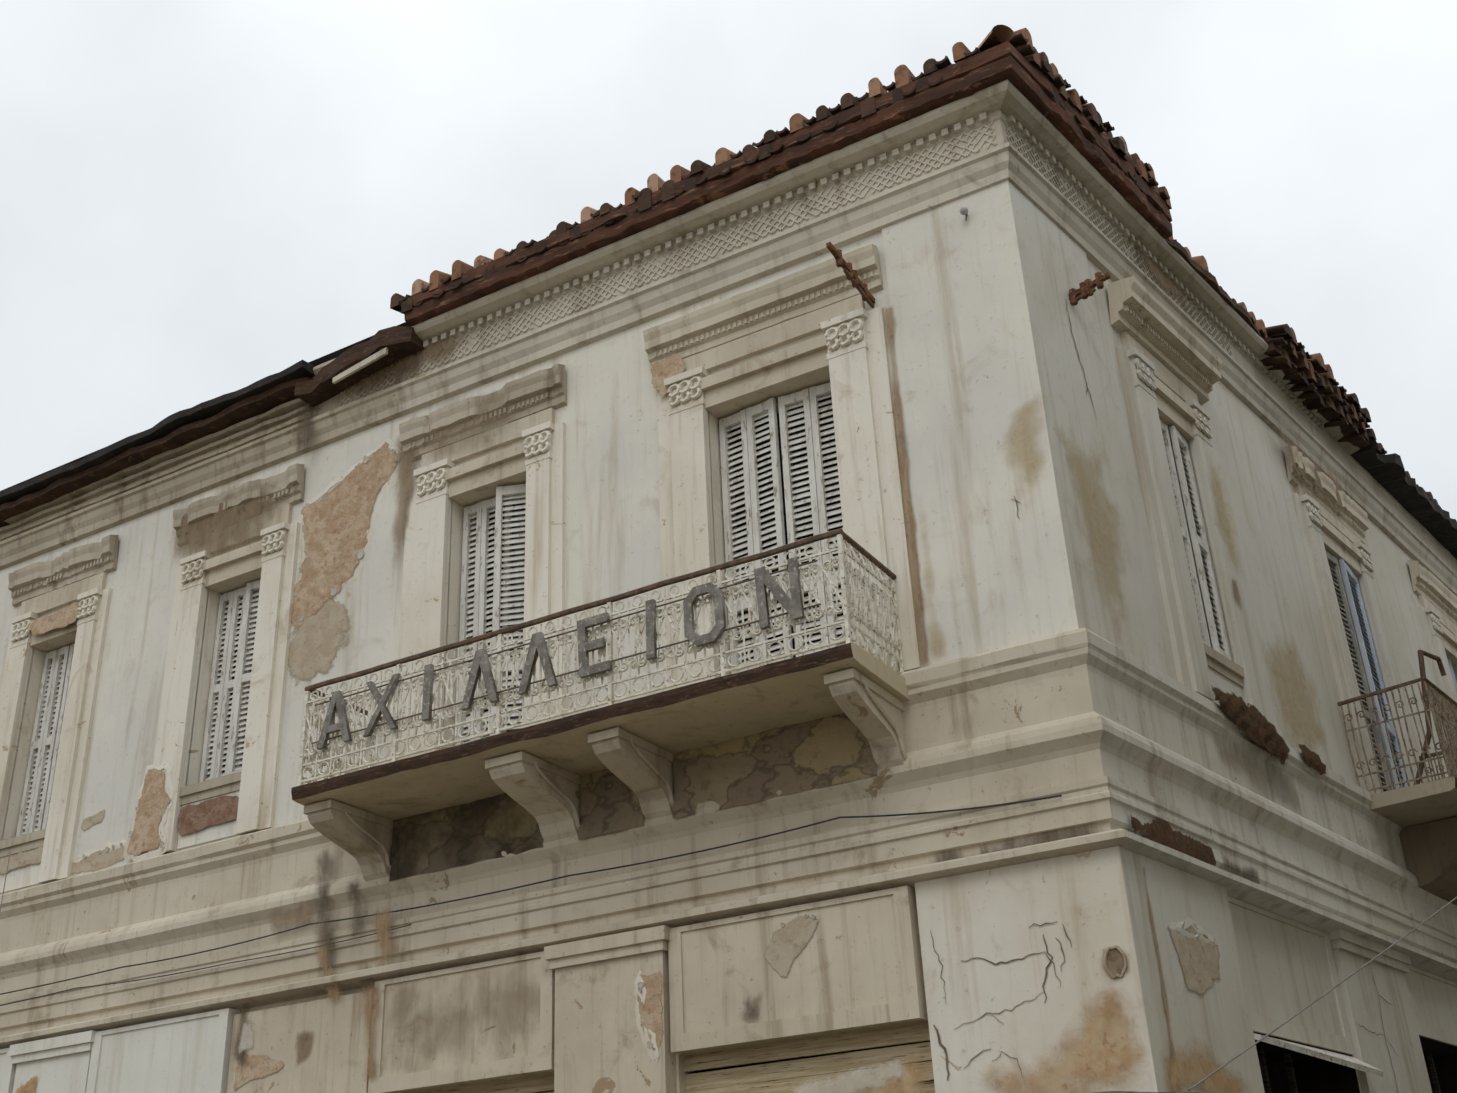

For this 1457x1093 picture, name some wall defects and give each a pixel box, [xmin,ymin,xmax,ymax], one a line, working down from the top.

crack [1066,301,1097,418]
flaking render [288,438,399,685]
flaking render [71,762,239,875]
flaking render [633,971,664,1065]
flaking render [764,914,819,977]
crack [930,921,1072,1081]
flaking render [1167,916,1220,995]
peeling [16,1077,37,1093]